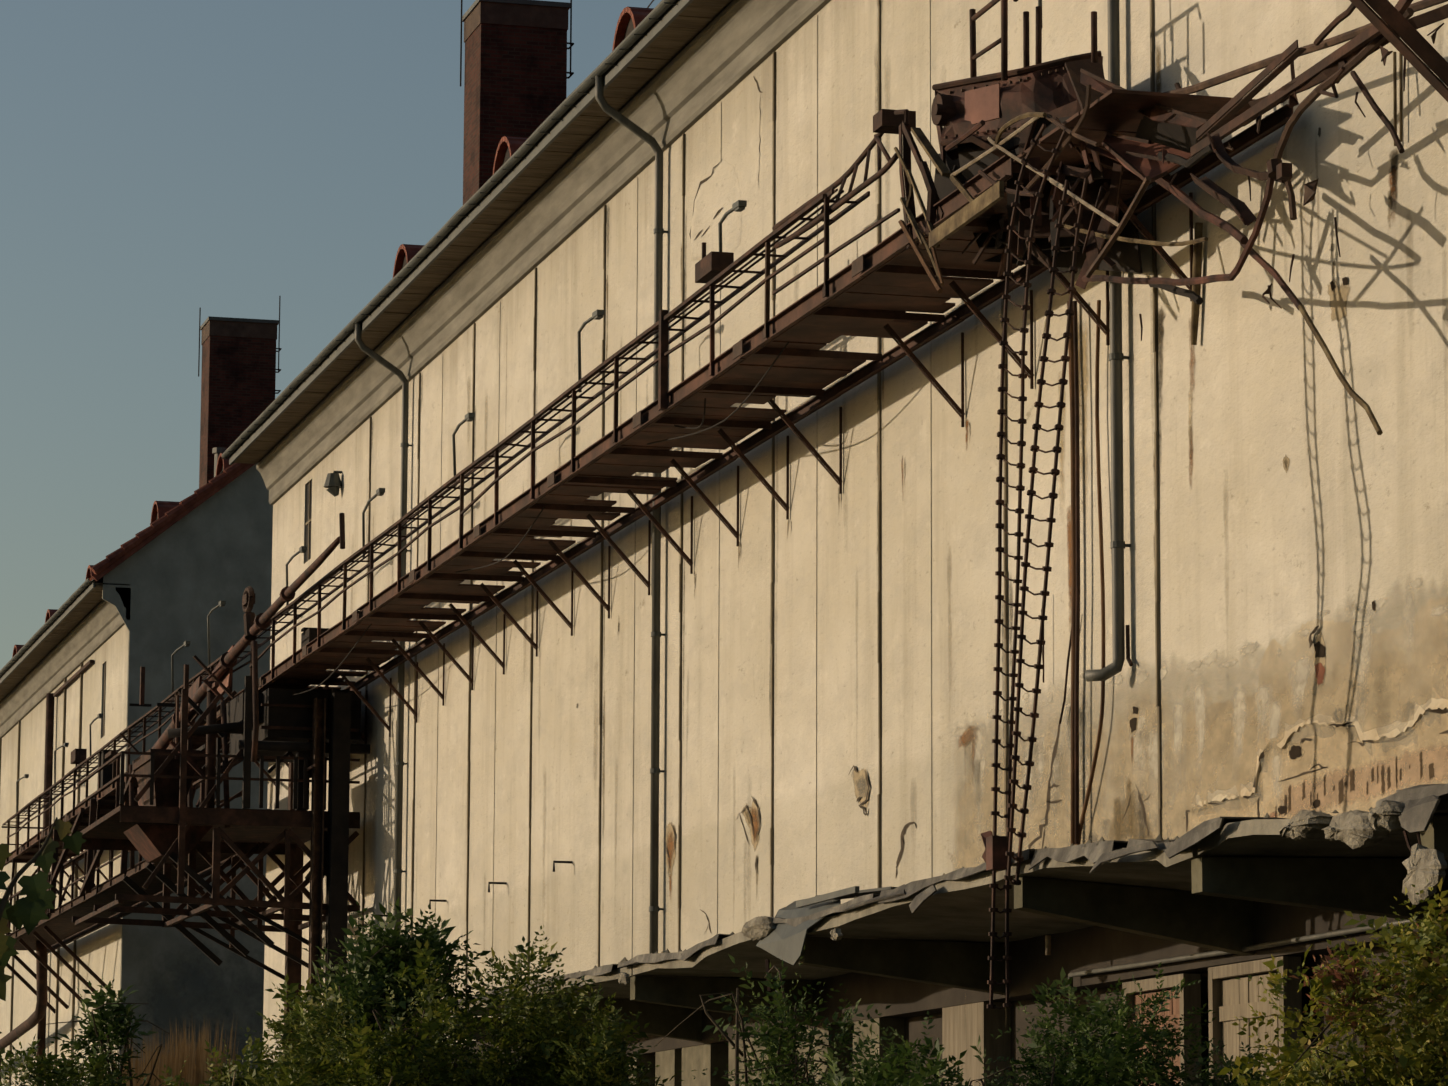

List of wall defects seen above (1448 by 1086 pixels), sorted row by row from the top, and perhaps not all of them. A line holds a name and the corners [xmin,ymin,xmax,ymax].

spalling [955,579,1448,869]
peeling [849,765,870,816]
crack [896,822,916,876]